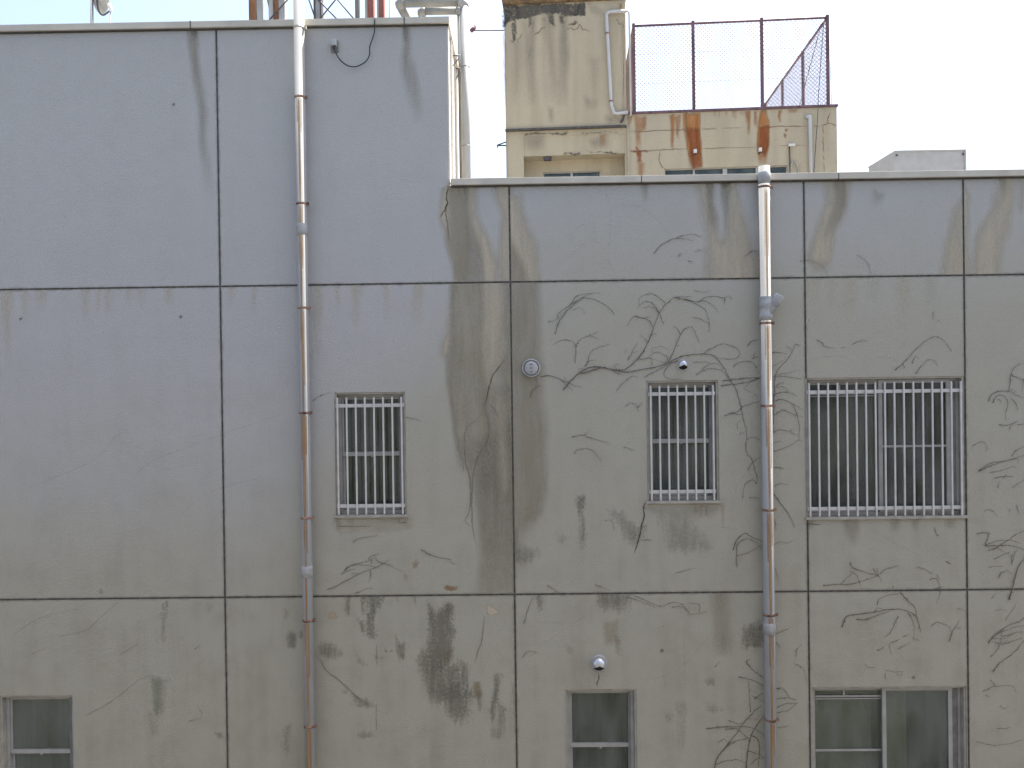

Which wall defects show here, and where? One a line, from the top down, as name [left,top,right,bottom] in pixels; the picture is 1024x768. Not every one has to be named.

corrosion [670,114,702,168]
corrosion [747,111,787,160]
damp [810,181,848,265]
damp [441,186,542,573]
damp [423,605,477,716]